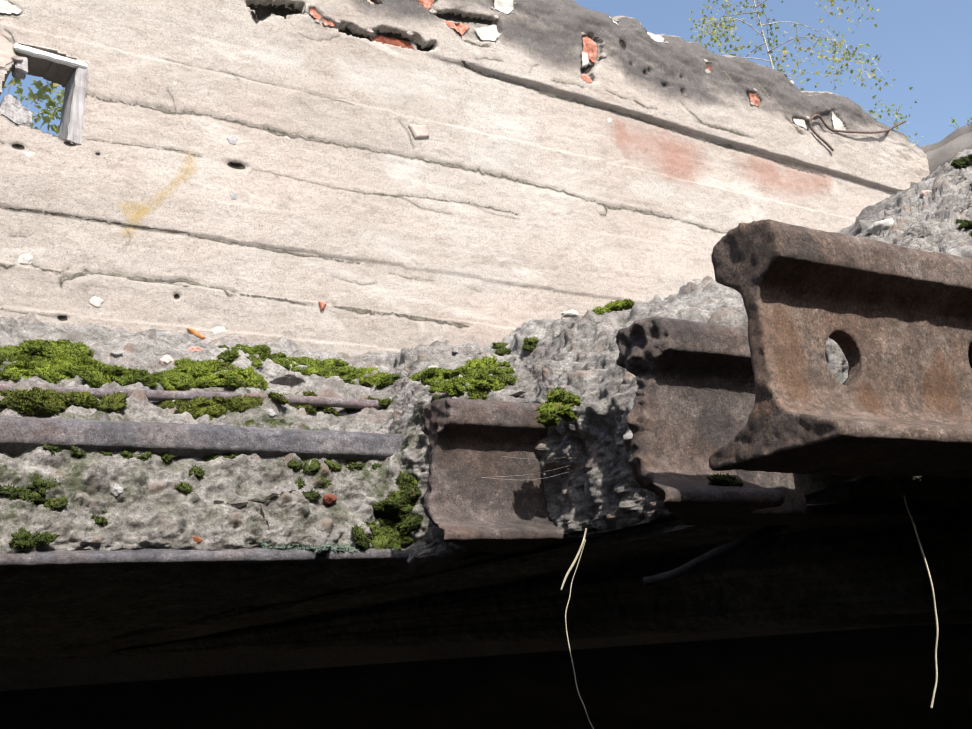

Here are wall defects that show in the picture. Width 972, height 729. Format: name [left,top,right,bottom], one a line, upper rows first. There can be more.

spalling [0,0,23,18]
spalling [246,0,437,52]
water stain [357,0,435,18]
spalling [417,0,516,42]
spalling [0,33,23,70]
spalling [580,32,607,84]
water stain [473,0,906,137]
spalling [792,108,846,134]